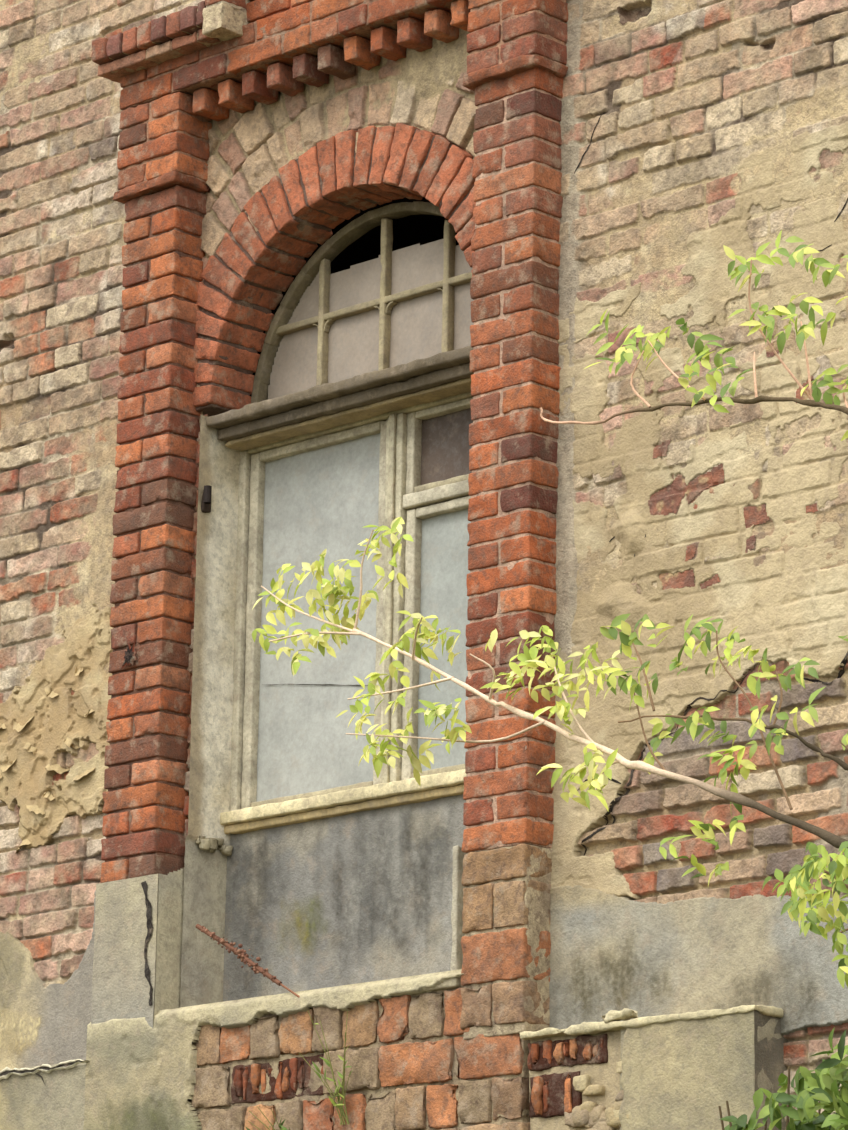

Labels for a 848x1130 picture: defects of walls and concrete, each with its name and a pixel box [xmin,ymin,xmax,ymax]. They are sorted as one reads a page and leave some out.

flaking render [551,121,848,900]
flaking render [0,603,137,852]
crack [141,881,153,1006]
crack [0,1059,89,1086]